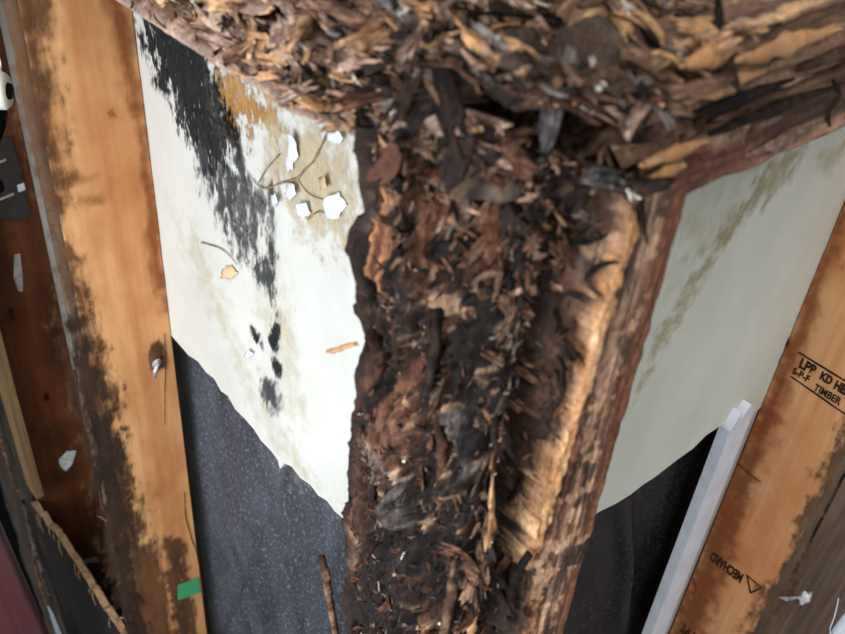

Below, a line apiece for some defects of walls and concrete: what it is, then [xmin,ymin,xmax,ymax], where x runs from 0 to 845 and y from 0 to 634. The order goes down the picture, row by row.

damp [110,0,364,415]
damp [717,152,798,249]
damp [1,0,196,634]
peeling [435,385,462,409]
peeling [480,220,577,478]
damp [672,202,845,634]
peeling [367,472,378,524]
peeling [507,471,524,502]
peeling [436,522,513,634]